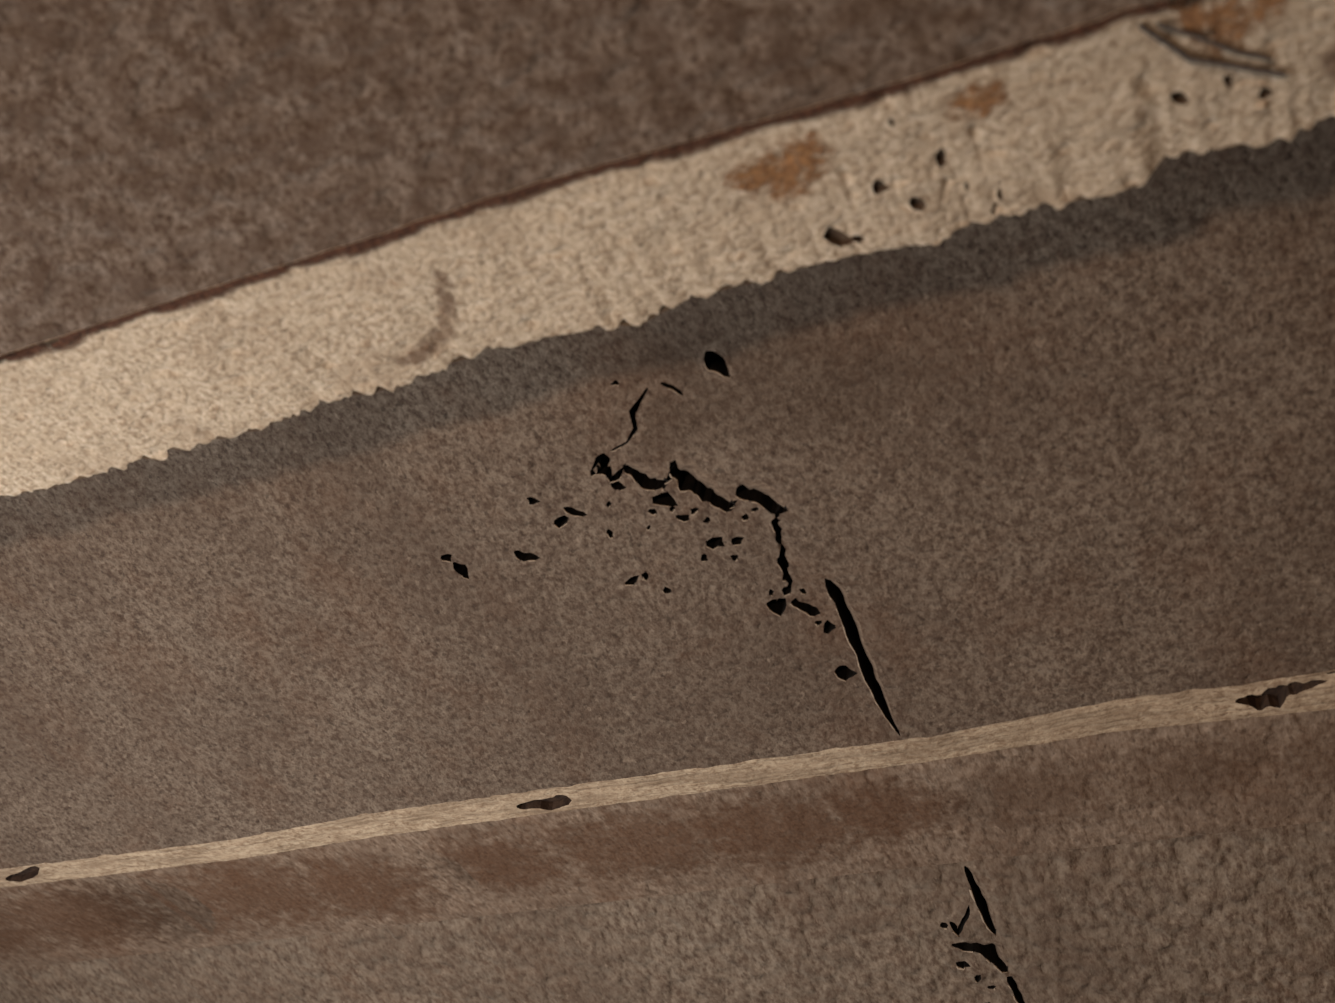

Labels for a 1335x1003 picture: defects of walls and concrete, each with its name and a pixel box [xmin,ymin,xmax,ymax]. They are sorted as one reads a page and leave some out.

rust [0,0,1286,361]
spalling [0,0,1335,496]
crack [703,351,730,378]
crack [441,554,469,580]
crack [514,550,540,562]
crack [527,380,901,737]
crack [940,866,1027,1003]